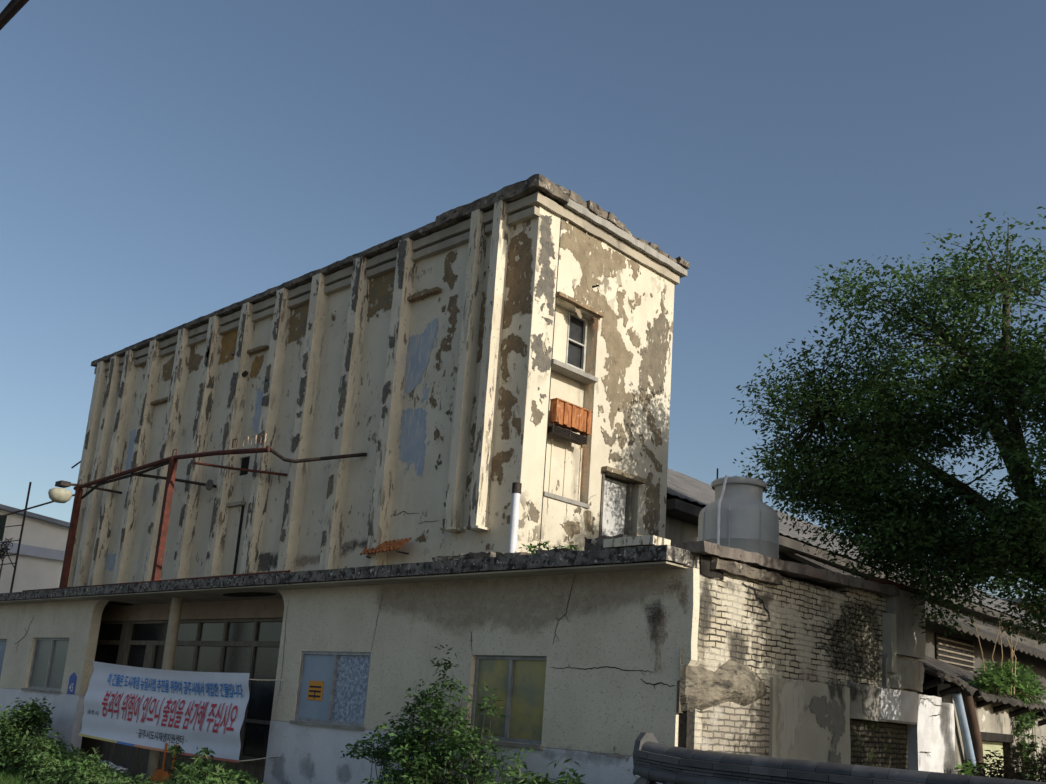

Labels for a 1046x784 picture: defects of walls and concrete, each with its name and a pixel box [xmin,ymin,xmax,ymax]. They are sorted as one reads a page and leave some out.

peeling [351,240,428,322]
peeling [84,345,154,449]
peeling [118,393,146,485]
peeling [161,305,271,450]
peeling [273,279,319,418]
peeling [334,332,353,439]
peeling [381,250,462,478]
peeling [491,214,671,536]
peeling [280,481,290,542]
peeling [560,502,595,545]
crack [551,577,675,689]
peeling [805,679,846,763]